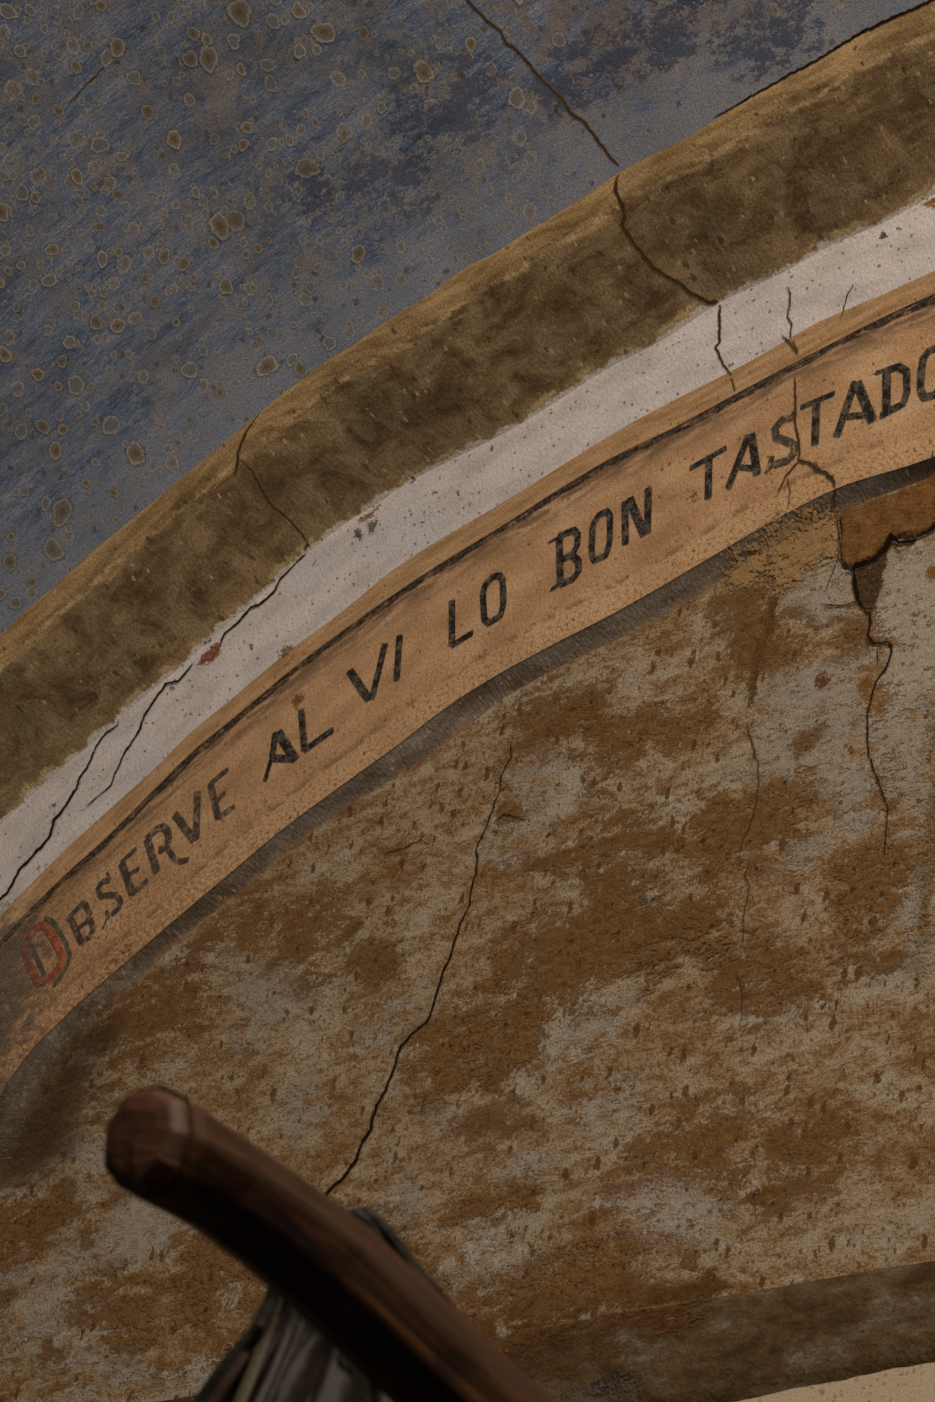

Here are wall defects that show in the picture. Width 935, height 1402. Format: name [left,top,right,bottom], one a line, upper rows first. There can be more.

water stain [162,0,336,92]
crack [467,0,735,391]
water stain [0,335,145,467]
water stain [0,495,72,609]
crack [220,416,309,645]
crack [777,287,935,855]
crack [0,663,193,900]
peeling [718,474,935,992]
crack [325,741,525,1195]